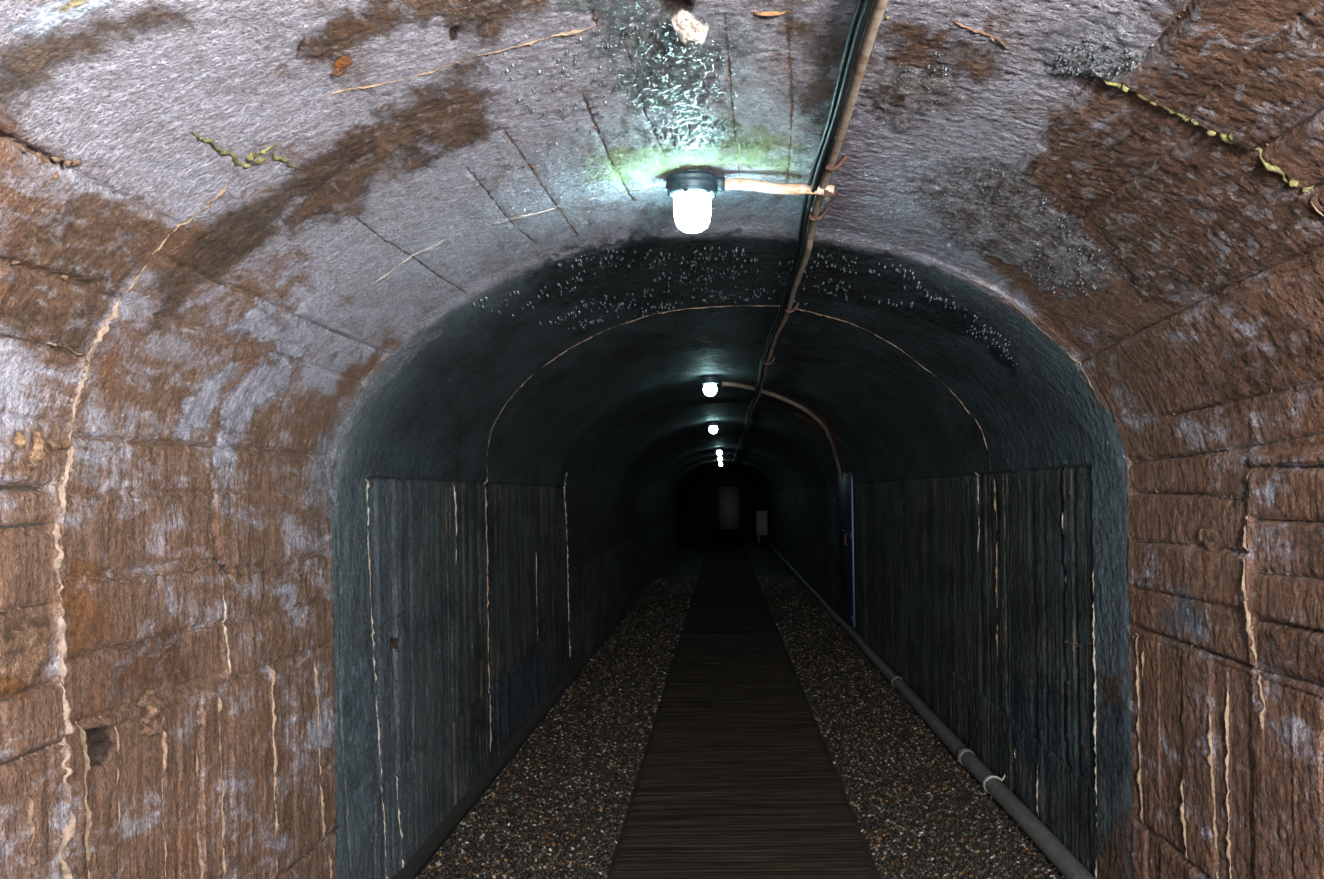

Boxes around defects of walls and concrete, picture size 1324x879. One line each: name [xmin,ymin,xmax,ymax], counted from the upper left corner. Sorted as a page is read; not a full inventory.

leakage [0,0,191,104]
spalling [661,0,709,49]
leakage [867,65,965,133]
leakage [906,158,1119,301]
crack [967,0,1324,402]
crack [1169,378,1324,417]
crack [0,131,417,879]
crack [1132,432,1324,687]